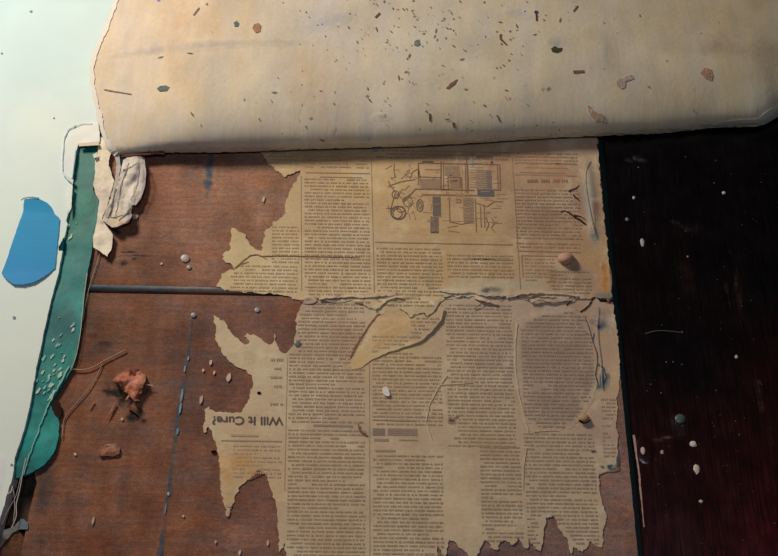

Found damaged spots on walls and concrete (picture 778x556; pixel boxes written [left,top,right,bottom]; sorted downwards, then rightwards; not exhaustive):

crack [560,185,586,225]
crack [399,297,451,319]
crack [350,314,380,358]